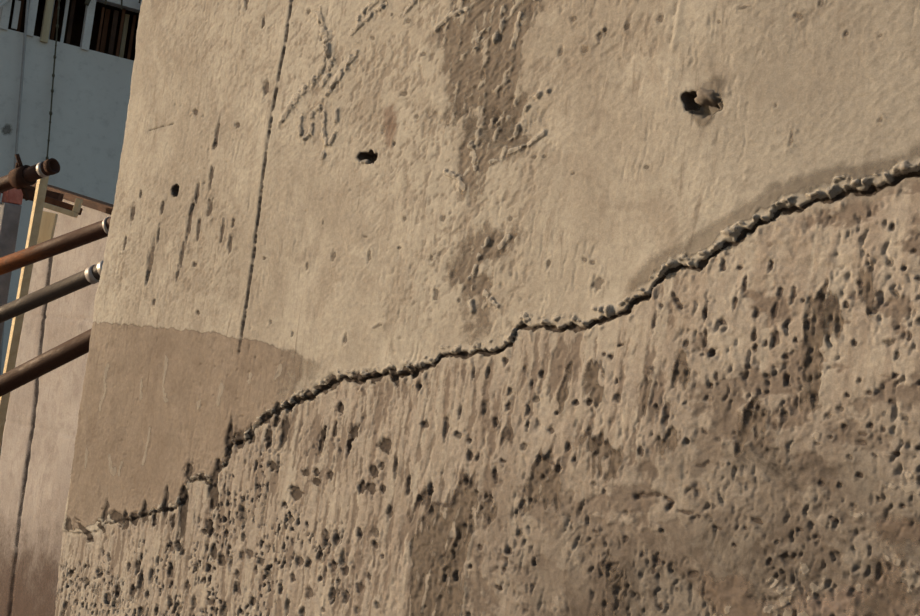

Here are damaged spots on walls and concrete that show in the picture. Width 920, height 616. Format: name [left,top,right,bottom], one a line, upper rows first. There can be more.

spalling [176,167,214,280]
peeling [448,217,520,345]
crack [65,161,920,550]
spalling [556,353,614,415]
spalling [672,341,690,389]
spalling [752,322,789,352]
spalling [772,283,849,419]
spalling [516,448,562,517]
spalling [567,427,622,493]
spalling [84,556,174,602]
spalling [195,505,264,594]
spalling [407,472,497,616]